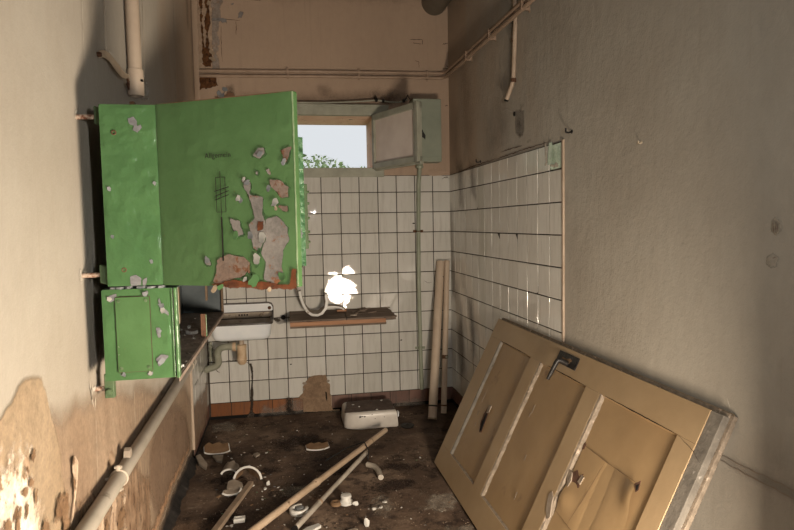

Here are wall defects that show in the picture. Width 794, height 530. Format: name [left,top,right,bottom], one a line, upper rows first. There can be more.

flaking render [0,446,98,530]
damp [0,378,167,530]
damp [104,385,207,530]
crack [721,455,794,500]